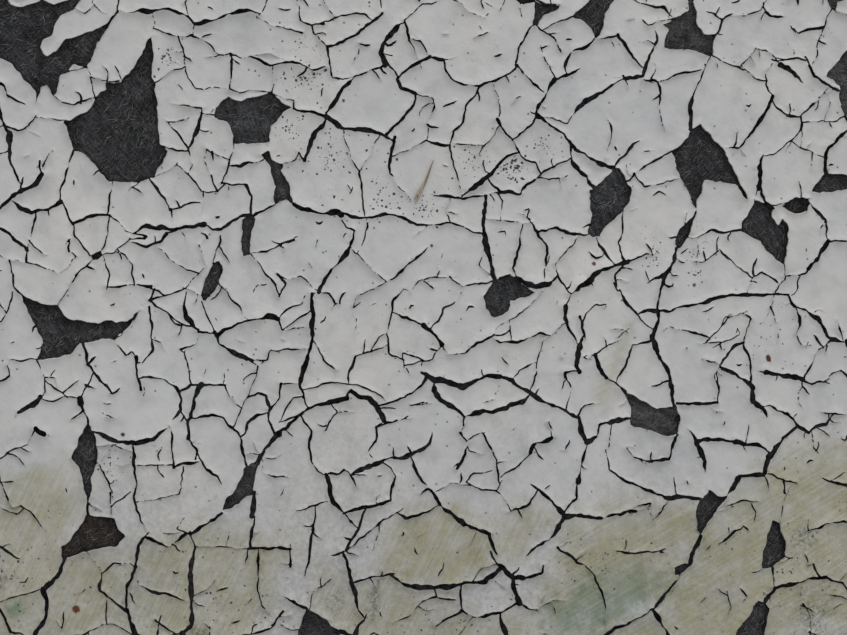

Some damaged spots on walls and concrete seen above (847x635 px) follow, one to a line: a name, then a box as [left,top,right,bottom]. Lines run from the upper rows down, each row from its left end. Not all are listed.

peeling [0,0,178,193]
crack [249,0,468,177]
peeling [523,0,626,49]
crack [770,10,837,94]
peeling [191,83,303,311]
peeling [662,115,847,275]
crack [0,342,120,426]
peeling [0,251,149,370]
crack [512,74,847,495]
peeling [51,413,136,568]
crack [82,513,222,635]
crack [216,492,292,609]